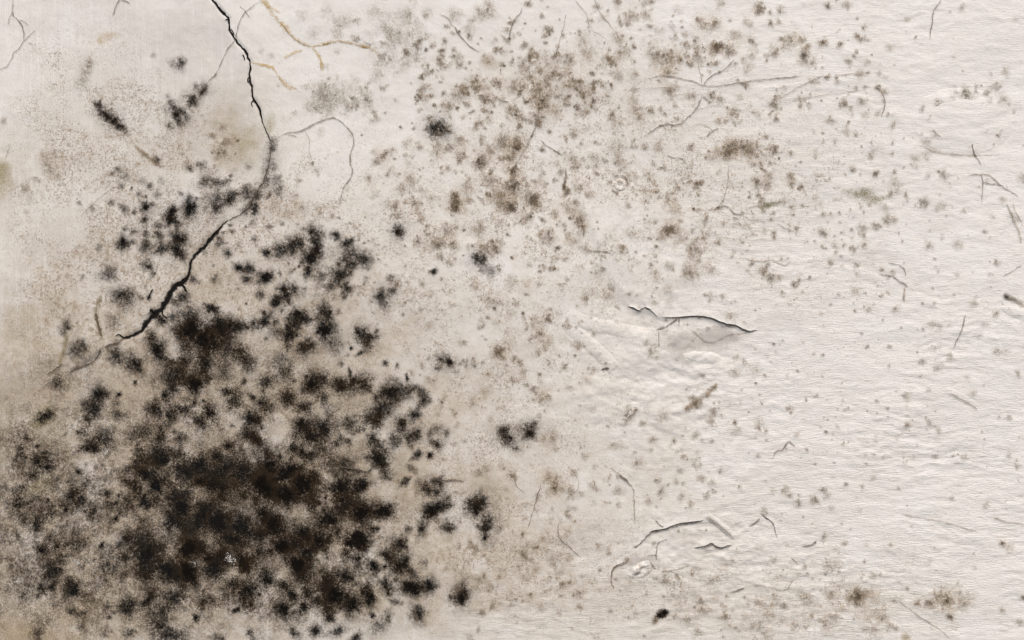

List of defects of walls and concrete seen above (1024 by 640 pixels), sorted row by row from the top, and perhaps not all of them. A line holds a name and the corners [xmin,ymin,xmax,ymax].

damp [650,39,733,81]
damp [111,163,281,268]
crack [48,0,354,374]
damp [399,17,637,280]
damp [646,215,719,260]
damp [724,140,803,239]
peeling [629,303,757,353]
damp [0,222,493,640]
peeling [607,512,779,588]